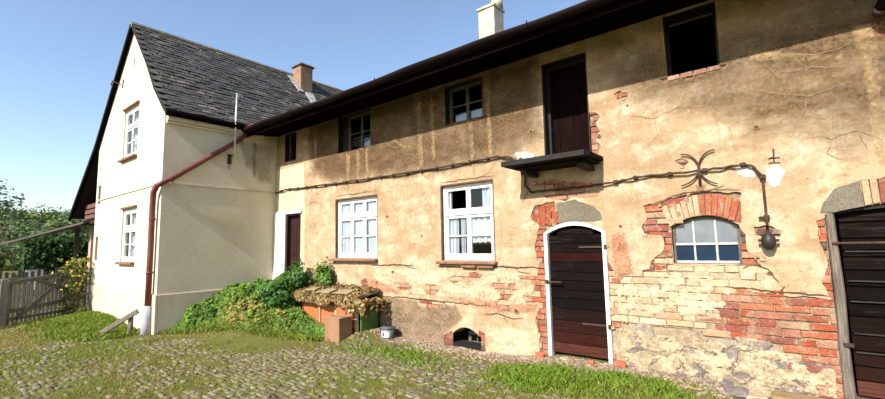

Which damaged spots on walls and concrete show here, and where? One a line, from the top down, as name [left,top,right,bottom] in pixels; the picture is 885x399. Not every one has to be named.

damp [310,61,538,179]
flaking render [590,112,601,154]
crack [740,41,884,160]
flaking render [860,177,885,206]
flaking render [360,179,597,356]
flaking render [606,191,844,399]